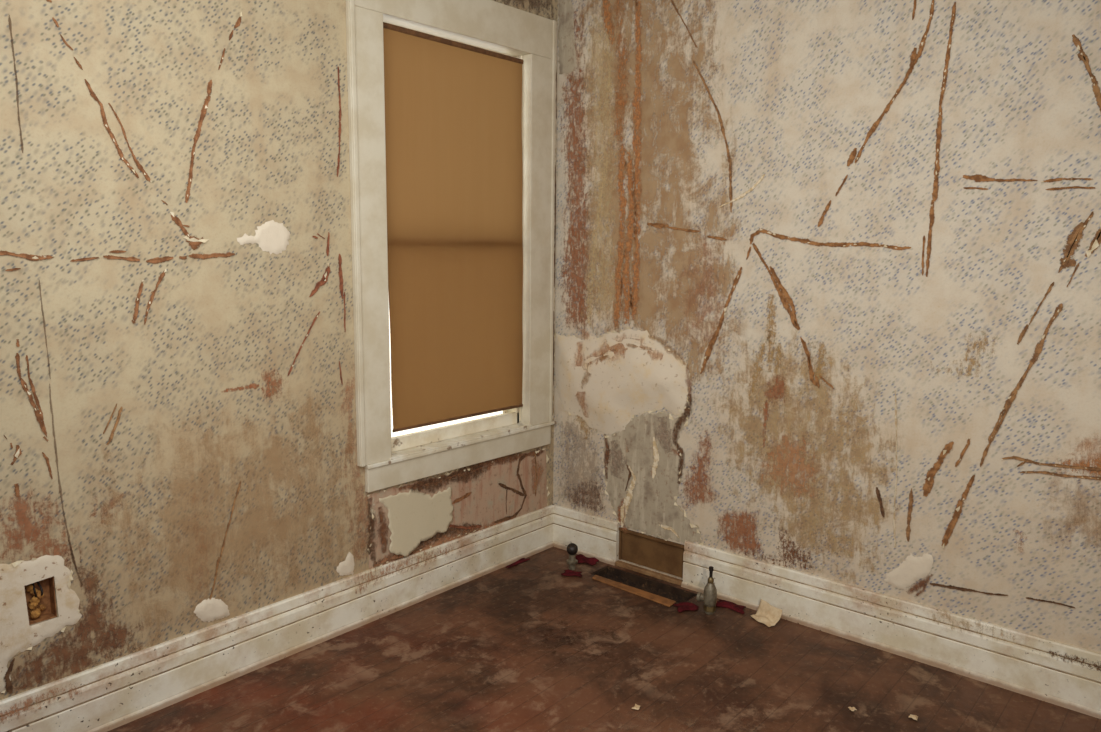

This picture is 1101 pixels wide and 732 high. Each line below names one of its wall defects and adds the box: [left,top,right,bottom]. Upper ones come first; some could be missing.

crack [8,15,24,153]
crack [46,0,242,205]
crack [335,66,343,177]
damp [561,0,738,381]
crack [0,250,235,325]
crack [338,254,346,331]
crack [647,0,1101,548]
crack [15,339,53,479]
peeling [355,448,550,593]
spalling [602,394,704,545]
damp [729,295,895,570]
crack [930,583,1075,608]